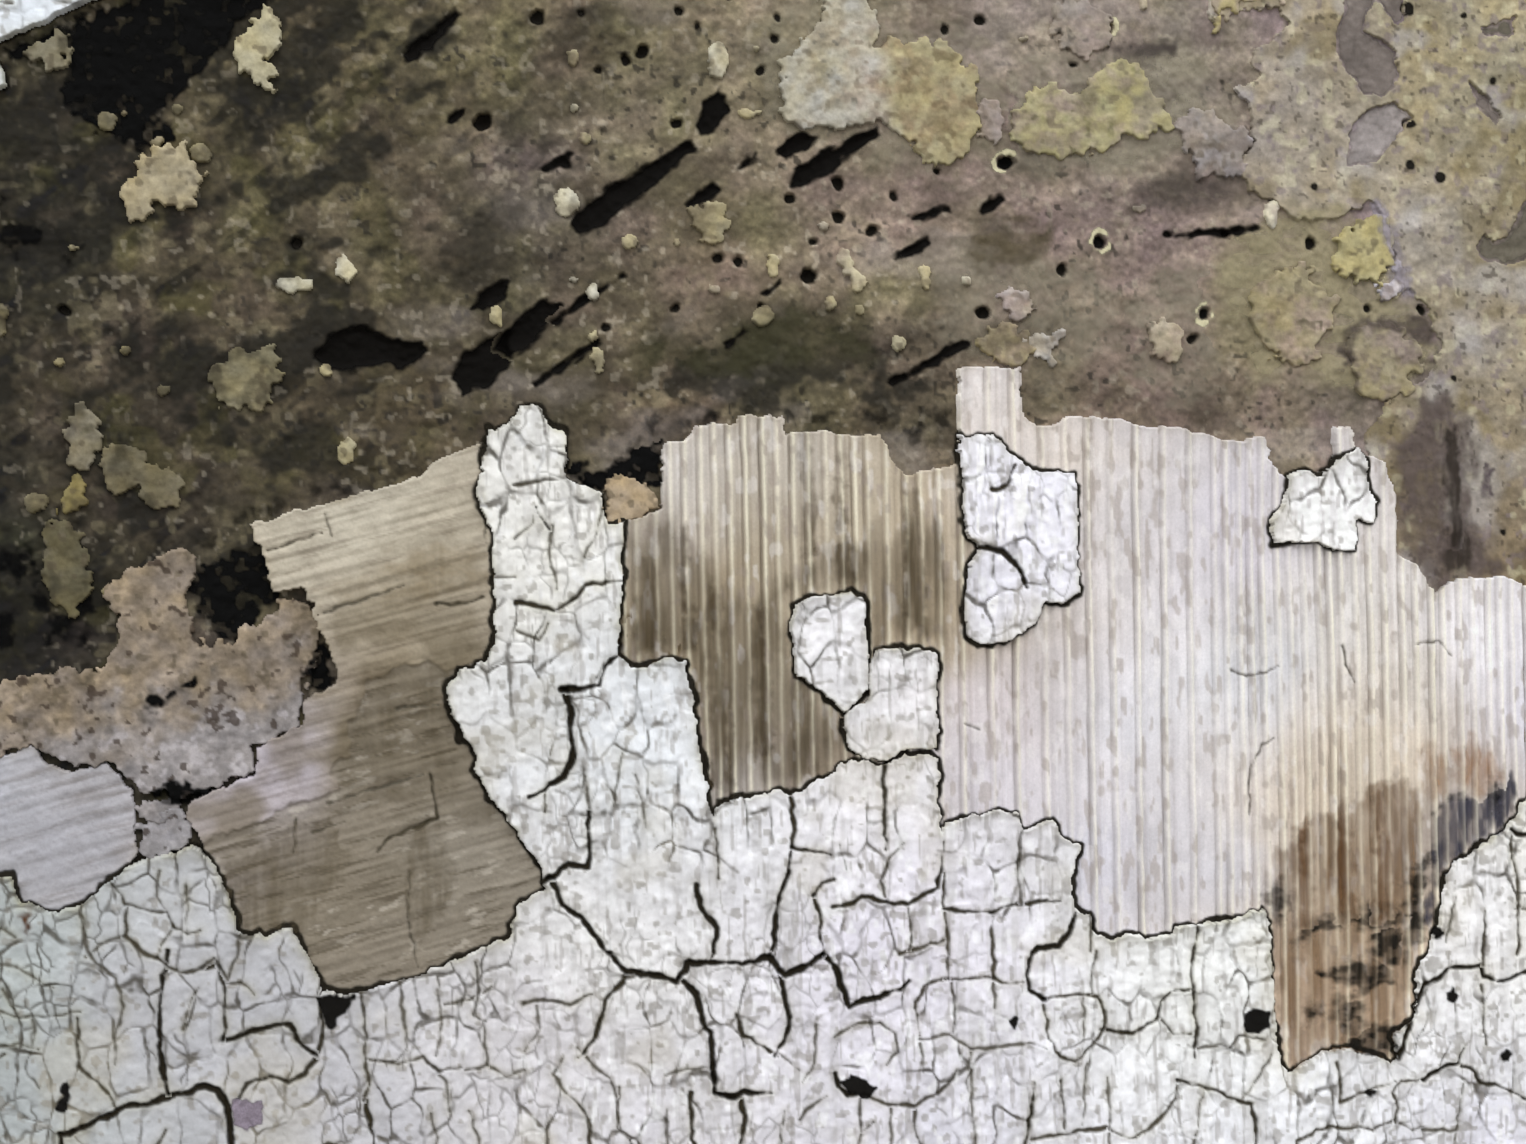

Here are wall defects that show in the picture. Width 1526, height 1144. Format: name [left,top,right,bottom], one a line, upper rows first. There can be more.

crack [0,870,324,1144]
crack [293,774,439,852]
peeling [0,324,1526,1144]
crack [360,656,1269,1144]
crack [1296,828,1526,1144]
damp [1424,893,1434,924]
damp [1431,774,1516,870]